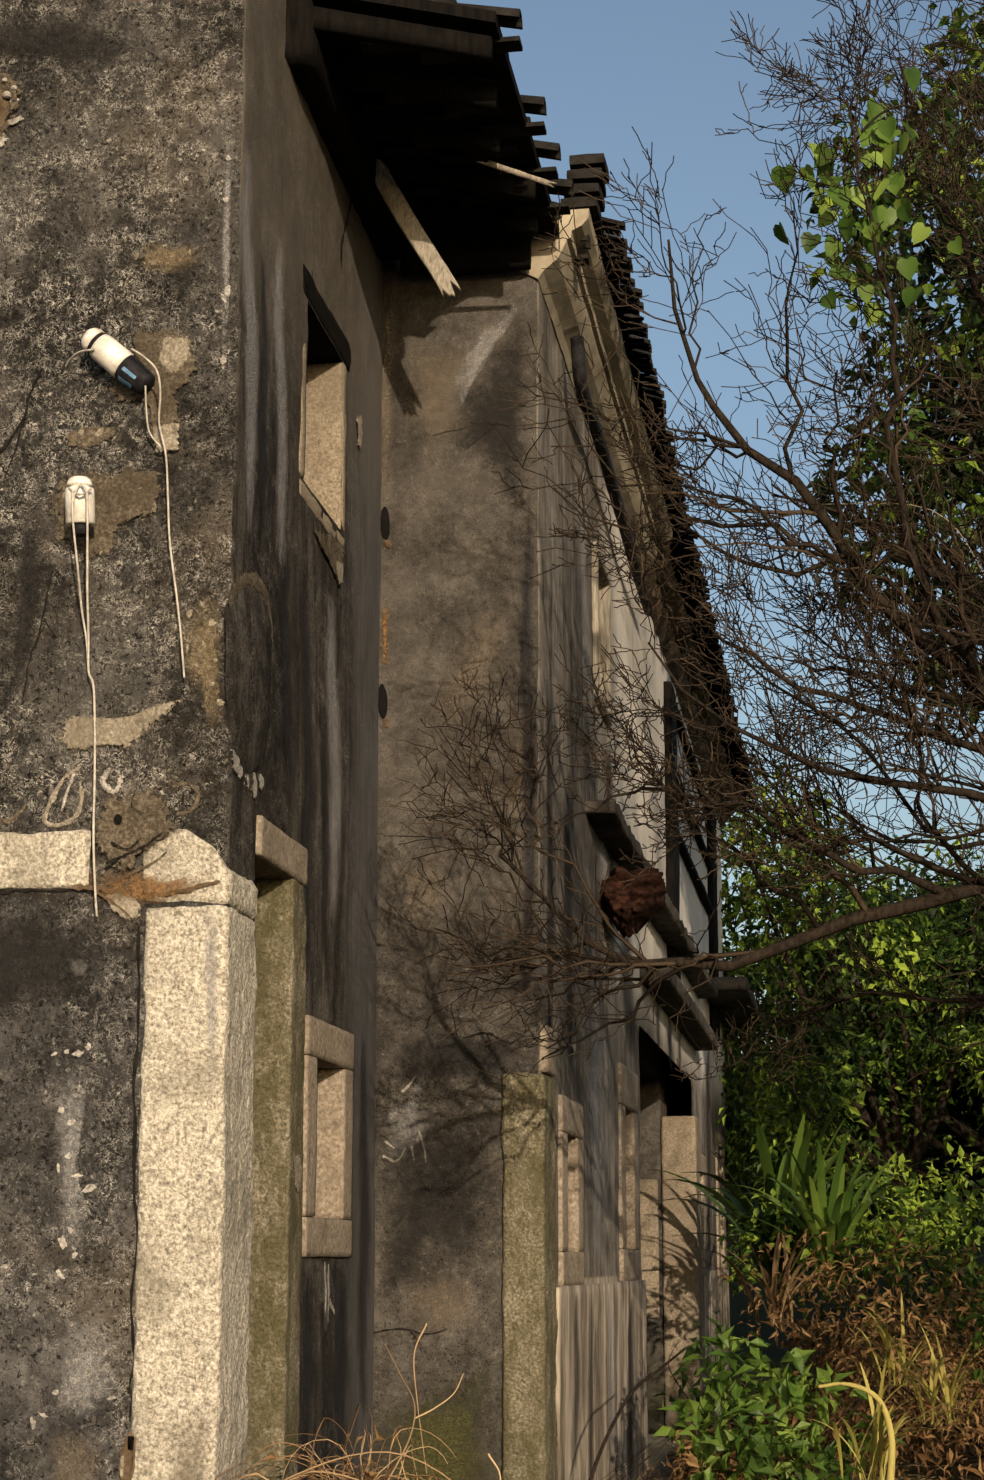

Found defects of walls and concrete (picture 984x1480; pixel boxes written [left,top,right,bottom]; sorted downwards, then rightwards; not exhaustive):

spalling [0,72,25,147]
peeling [47,326,200,563]
peeling [54,699,183,751]
rust [105,874,190,901]